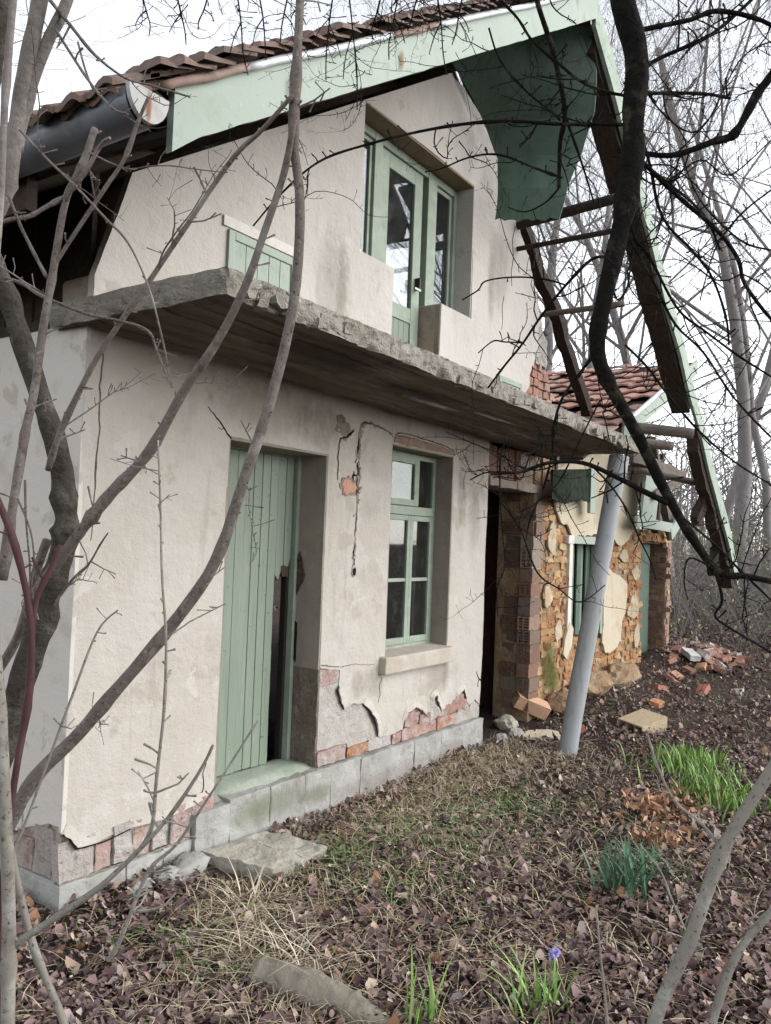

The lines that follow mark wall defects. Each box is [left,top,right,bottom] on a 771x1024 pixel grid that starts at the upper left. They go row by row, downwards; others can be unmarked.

flaking render [339,475,358,496]
crack [337,421,488,566]
spalling [290,621,479,767]
spalling [13,786,215,886]